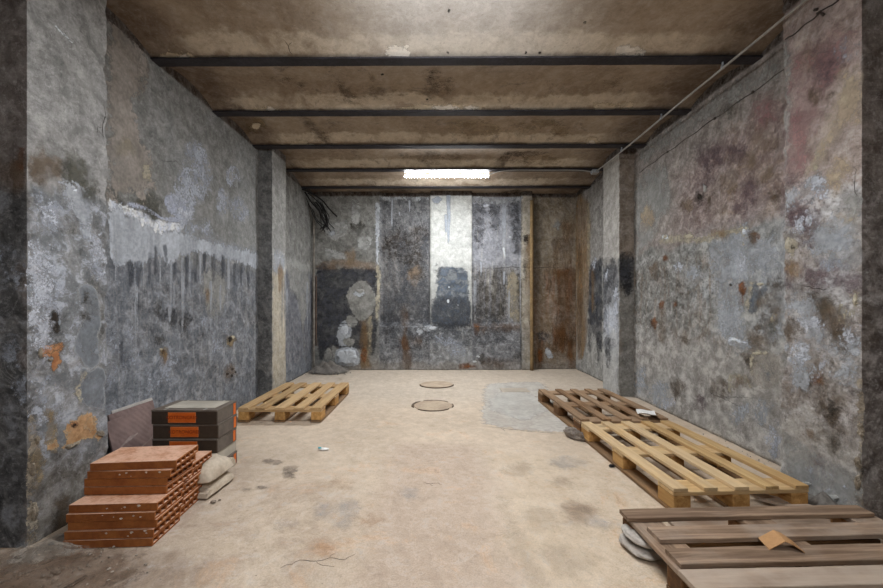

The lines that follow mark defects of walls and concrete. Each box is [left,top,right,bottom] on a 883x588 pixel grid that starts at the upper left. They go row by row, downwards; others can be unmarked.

efflorescence [107,142,249,237]
damp [771,170,828,234]
damp [5,240,60,358]
flaking render [38,283,101,371]
damp [156,269,230,353]
peeling [340,316,358,347]
damp [4,340,55,436]
flaking render [25,411,105,547]